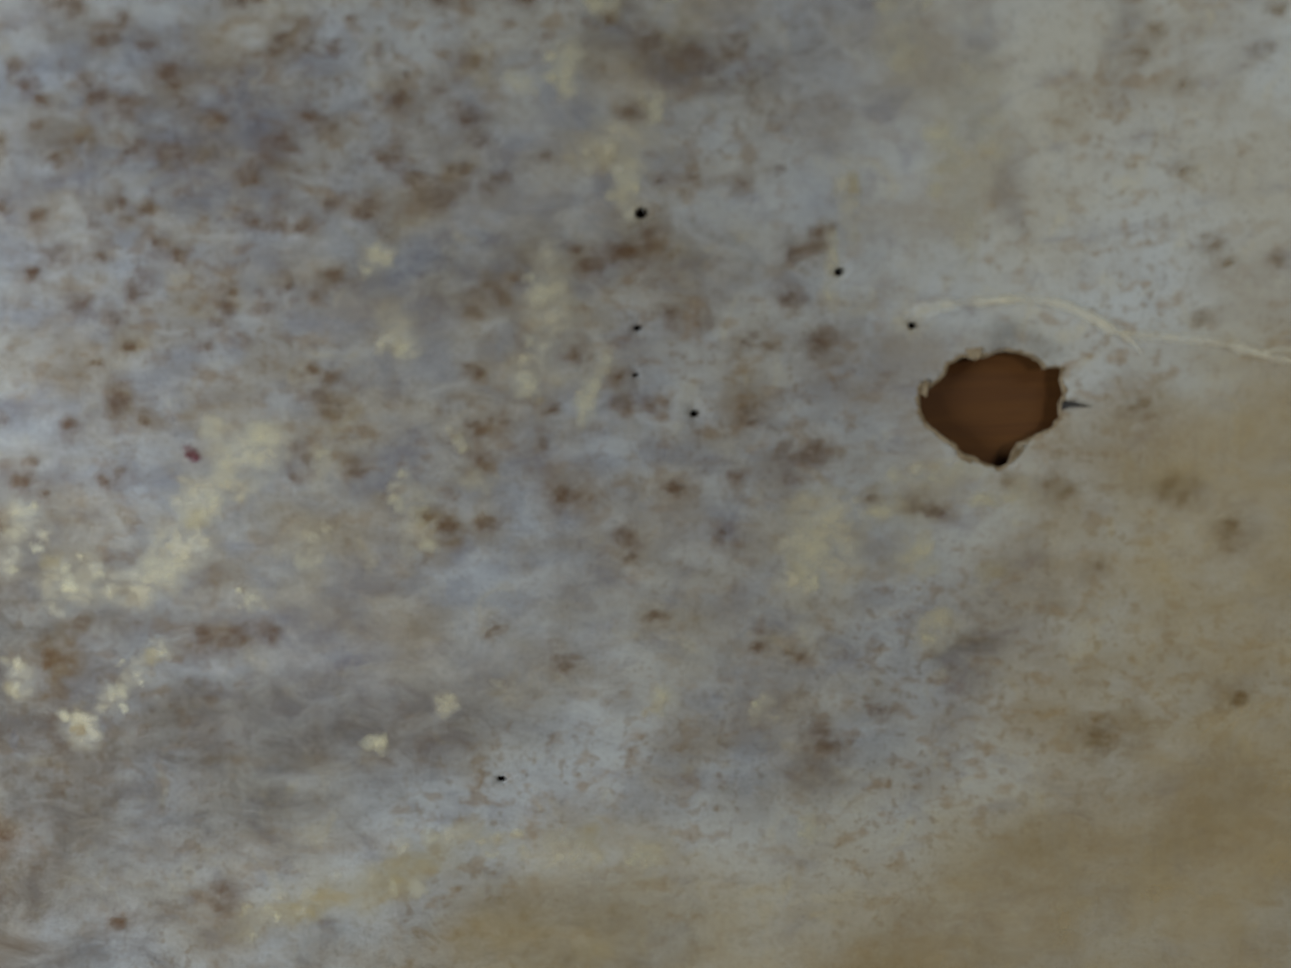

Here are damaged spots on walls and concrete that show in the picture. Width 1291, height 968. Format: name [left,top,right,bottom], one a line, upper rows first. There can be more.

crack [1055,301,1130,340]
leakage [0,854,66,968]